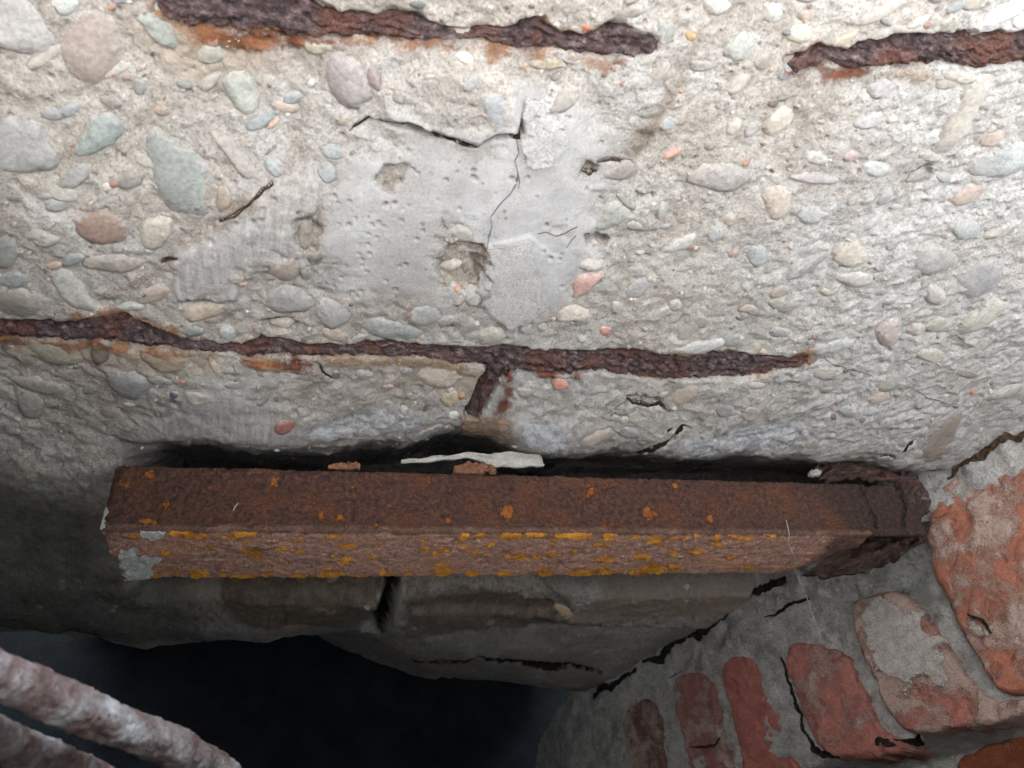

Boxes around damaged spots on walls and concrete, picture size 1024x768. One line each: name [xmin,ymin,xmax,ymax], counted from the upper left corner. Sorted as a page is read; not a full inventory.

rust [178,21,317,51]
rust [814,64,871,83]
crack [219,180,274,222]
crack [353,116,521,249]
peeling [438,241,542,331]
rust [242,353,463,372]
peeling [401,451,545,469]
crack [947,431,1024,480]
rust [802,462,932,580]
spalling [968,621,989,637]
crack [411,613,729,699]
crack [780,657,846,761]